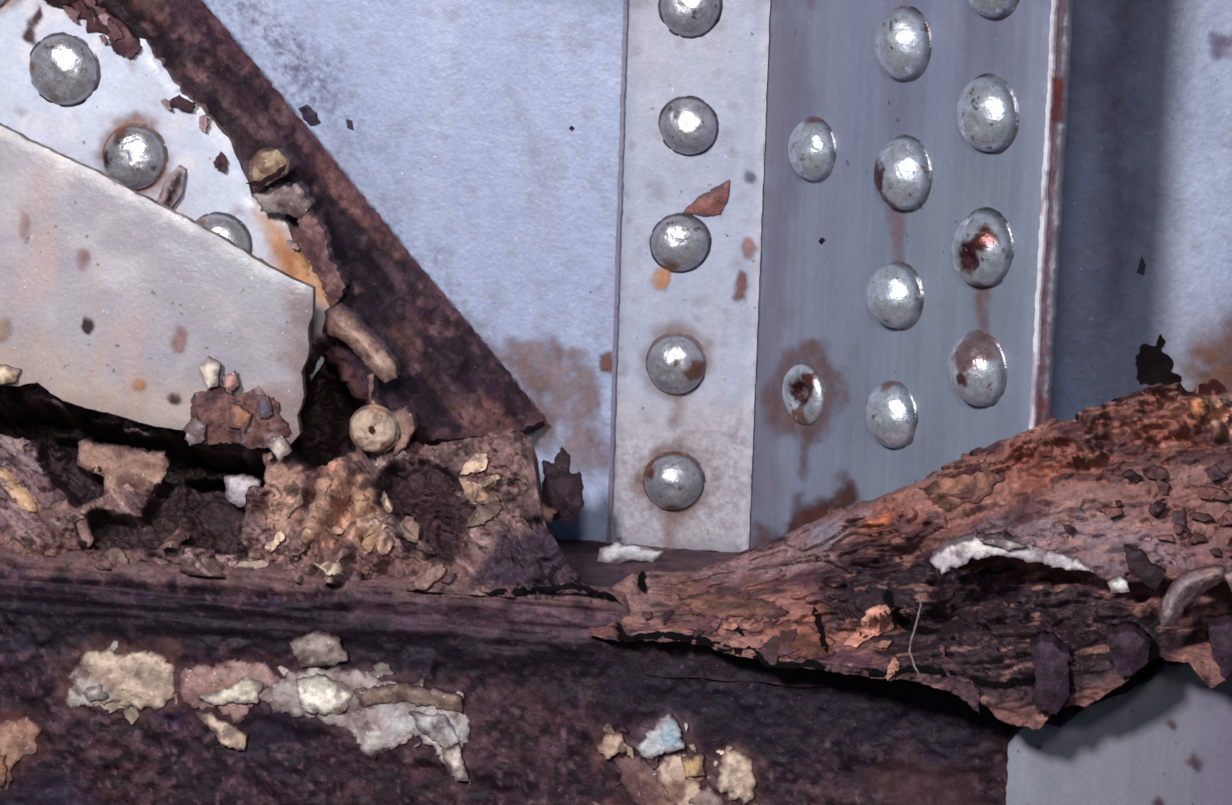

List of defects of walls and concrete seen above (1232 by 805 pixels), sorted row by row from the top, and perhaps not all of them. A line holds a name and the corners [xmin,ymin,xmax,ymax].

rust [23,7,42,44]
rust [246,146,418,456]
rust [168,356,293,462]
peeling [0,433,44,512]
peeling [224,471,446,590]
peeling [459,452,504,527]
crack [482,571,1036,689]
peeling [930,530,1130,593]
rust [1106,543,1232,678]
rust [0,710,43,791]
peeling [56,629,476,785]
rust [614,743,759,805]